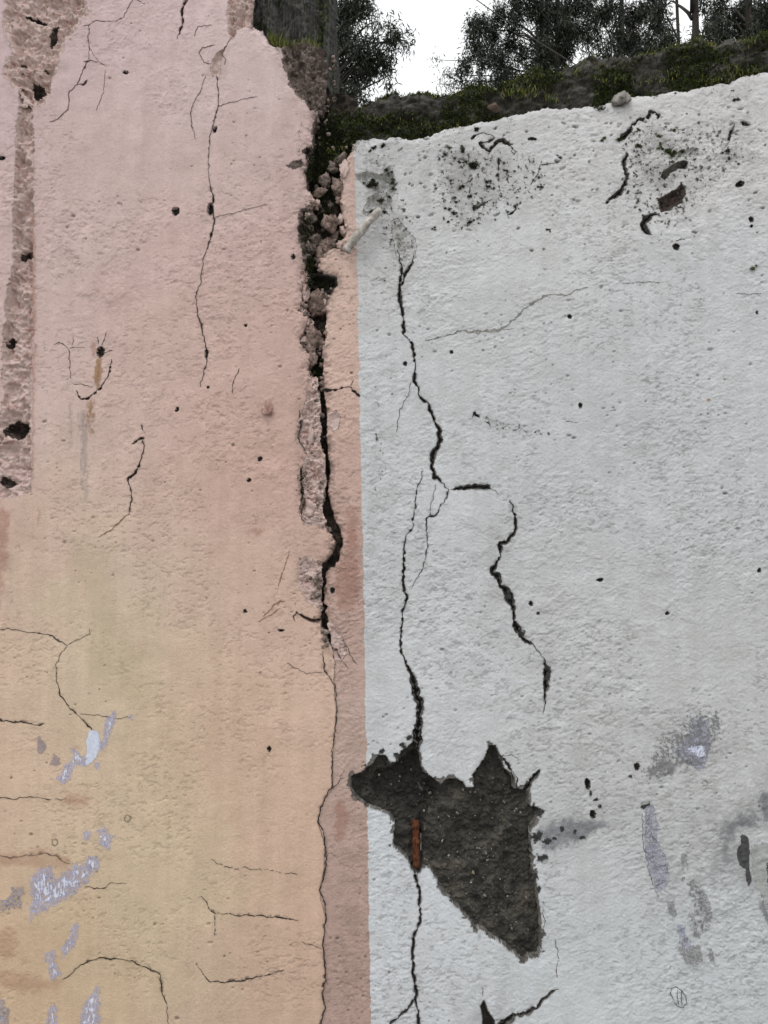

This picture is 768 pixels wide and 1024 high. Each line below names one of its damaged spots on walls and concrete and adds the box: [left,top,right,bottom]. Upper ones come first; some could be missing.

flaking render [0,0,88,500]
crack [177,0,266,386]
flaking render [291,205,311,265]
crack [100,425,145,537]
crack [196,53,360,1024]
crack [396,250,588,747]
peeling [37,711,116,784]
peeling [1,827,113,919]
peeling [79,987,101,1024]
crack [390,868,422,1024]
flaking render [352,728,539,957]
crack [499,907,559,1024]